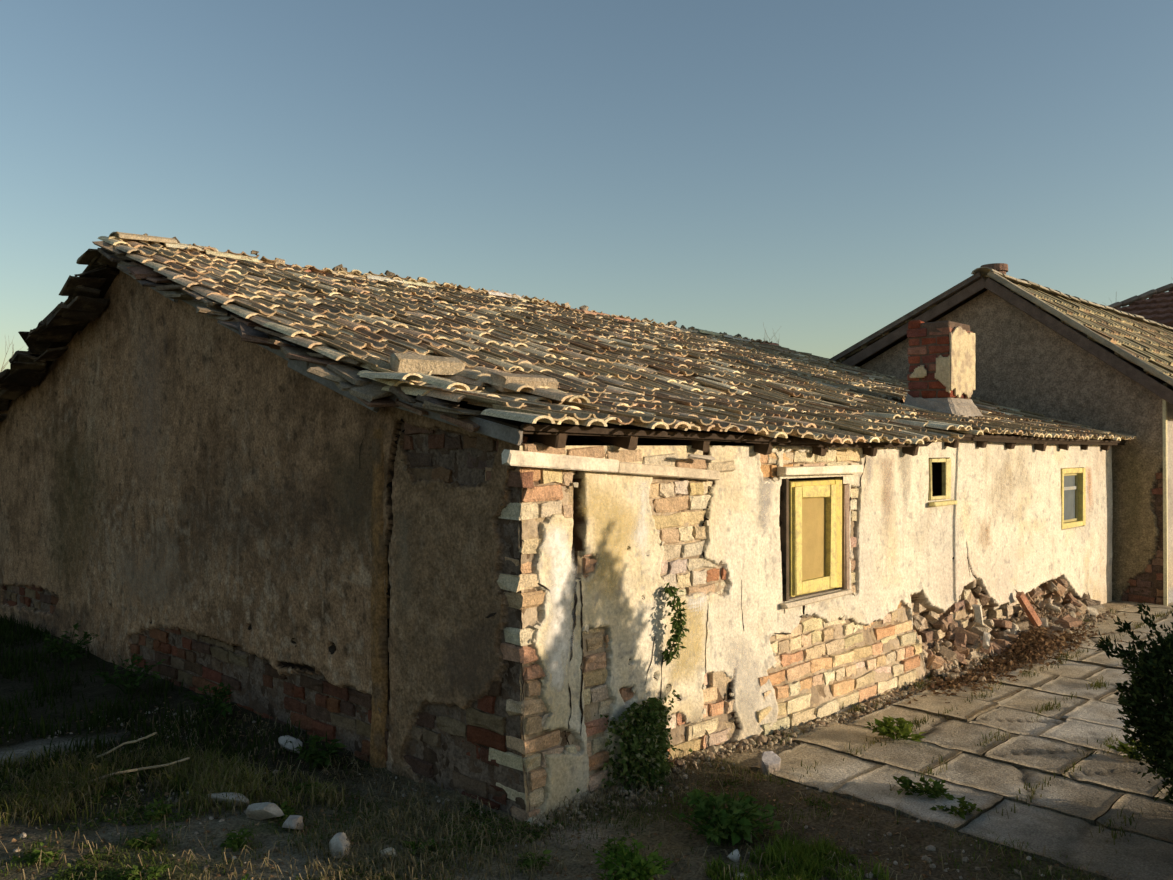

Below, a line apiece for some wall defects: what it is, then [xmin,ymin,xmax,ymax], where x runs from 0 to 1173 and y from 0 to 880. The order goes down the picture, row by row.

spalling [3,585,59,614]
spalling [129,621,390,762]
spalling [401,421,499,487]
spalling [404,466,637,822]
crack [538,578,584,745]
spalling [649,478,726,596]
spalling [653,670,736,762]
spalling [756,577,1105,736]
spalling [1122,526,1163,605]
spalling [1151,472,1163,511]